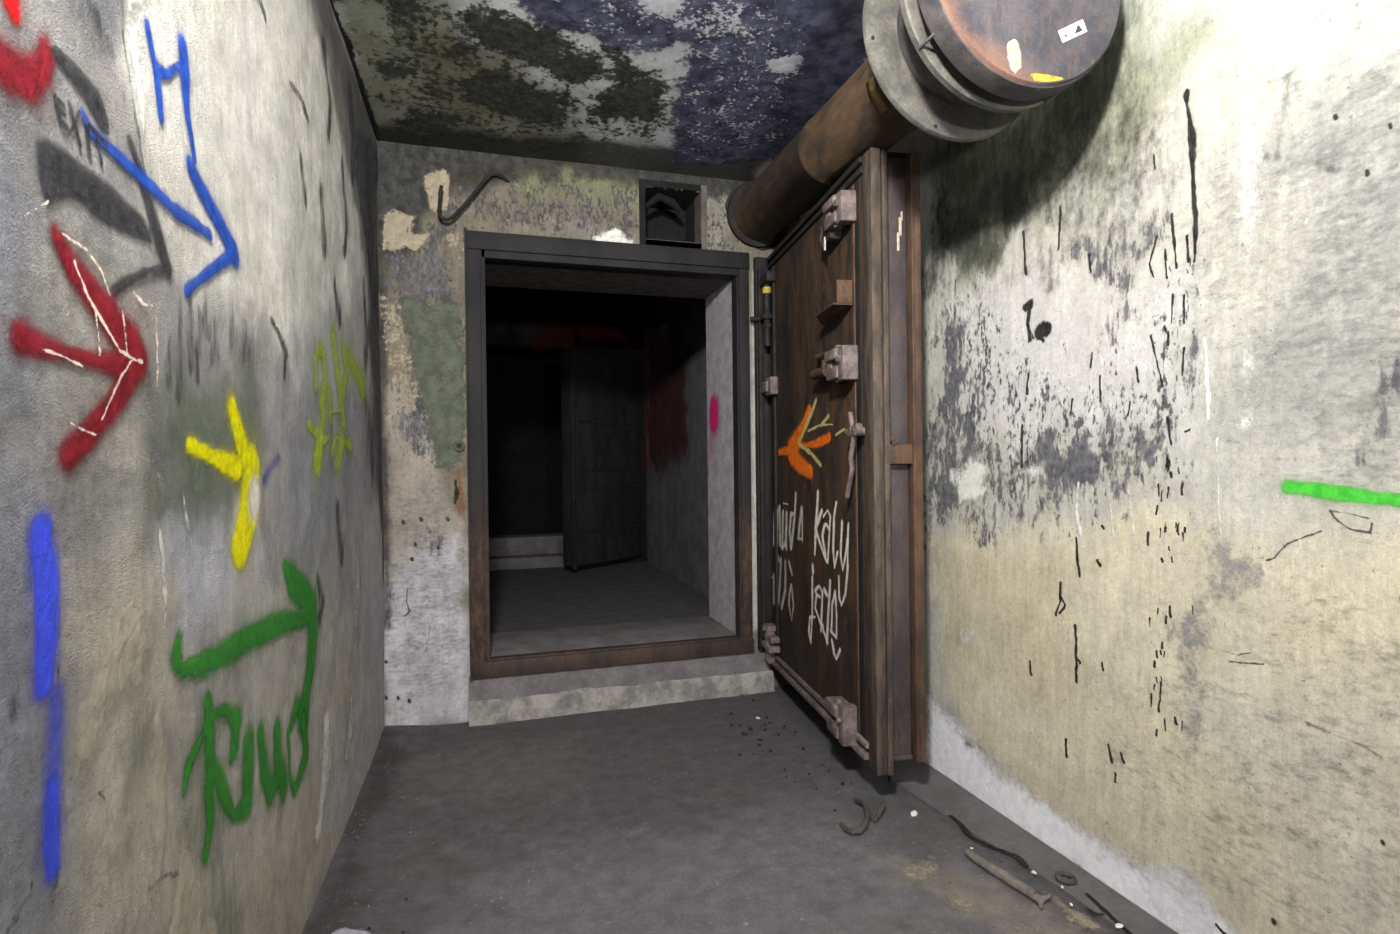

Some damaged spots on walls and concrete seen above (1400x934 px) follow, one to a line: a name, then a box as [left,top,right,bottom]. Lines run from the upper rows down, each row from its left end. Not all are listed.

peeling [382,209,429,251]
peeling [424,169,450,212]
peeling [593,228,633,243]
water stain [1021,89,1198,407]
peeling [379,296,419,409]
water stain [300,0,744,628]
peeling [1202,337,1211,420]
water stain [923,304,1191,563]
peeling [950,457,987,504]
peeling [1075,482,1085,549]
water stain [1055,581,1066,617]
water stain [925,695,1234,934]